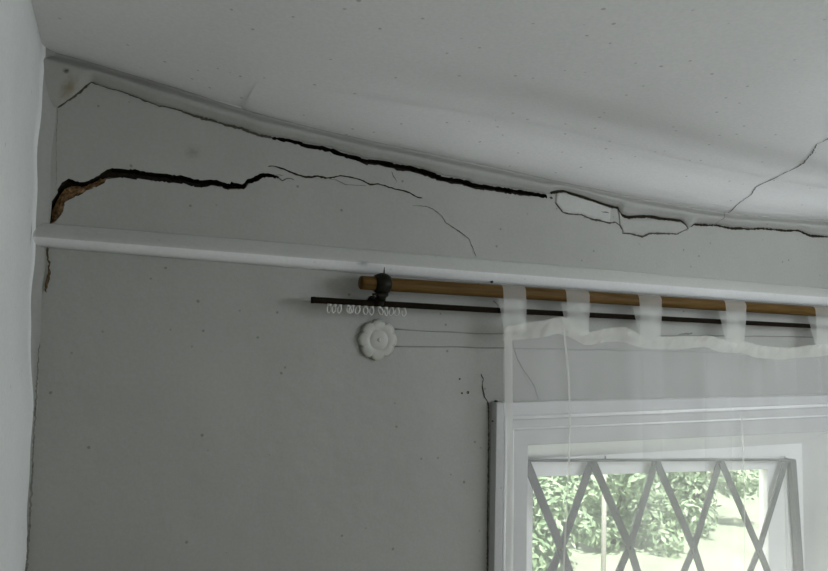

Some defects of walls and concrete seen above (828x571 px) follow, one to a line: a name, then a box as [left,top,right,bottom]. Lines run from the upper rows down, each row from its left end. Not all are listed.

crack [50,82,828,256]
crack [43,247,51,293]